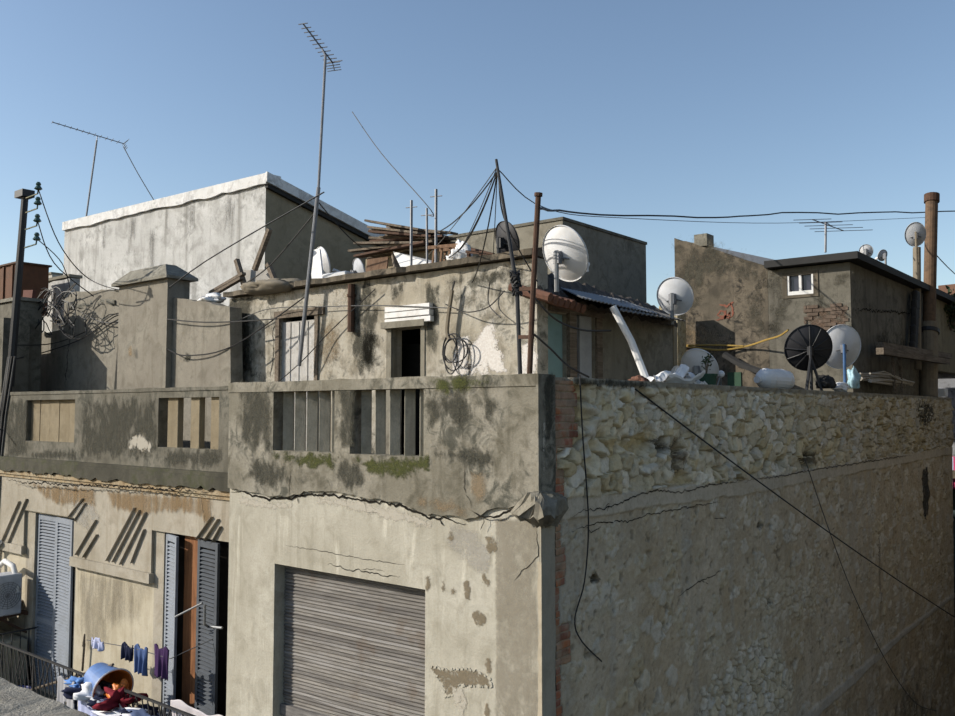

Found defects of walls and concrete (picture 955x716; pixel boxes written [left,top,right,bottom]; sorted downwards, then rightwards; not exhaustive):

damp [229,297,272,450]
damp [304,280,379,375]
peeling [452,323,538,376]
mould [6,398,156,461]
damp [339,390,354,447]
crack [7,478,211,525]
damp [337,461,363,489]
crack [236,464,512,530]
crack [573,455,908,533]
spalling [442,581,470,599]
spalling [472,611,486,626]
spalling [430,658,493,714]